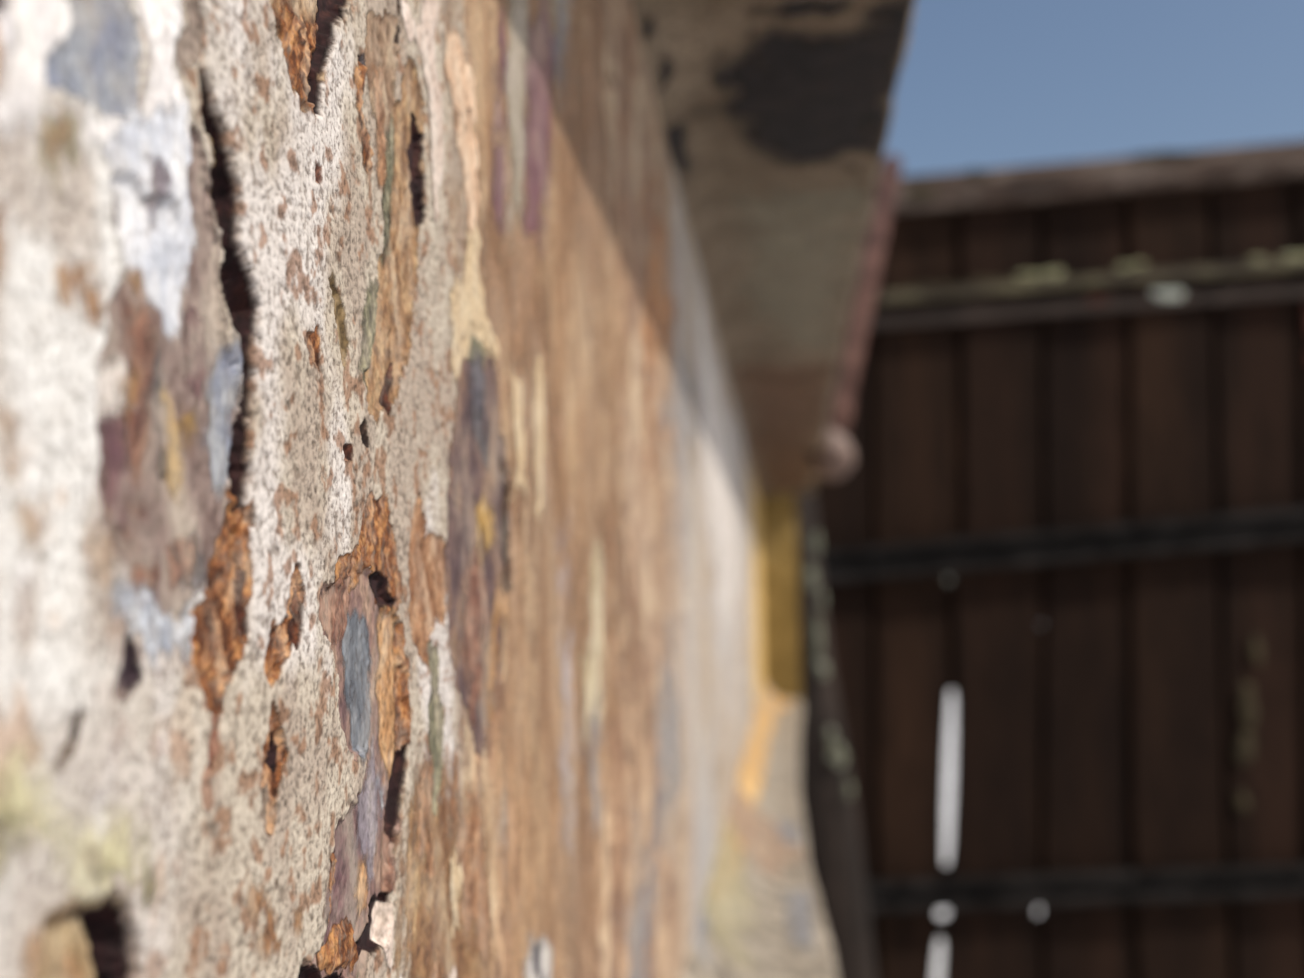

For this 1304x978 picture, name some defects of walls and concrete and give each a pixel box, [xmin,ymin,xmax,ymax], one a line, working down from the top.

peeling [0,0,255,716]
crack [199,75,254,517]
spalling [260,0,568,978]
spalling [69,896,128,978]